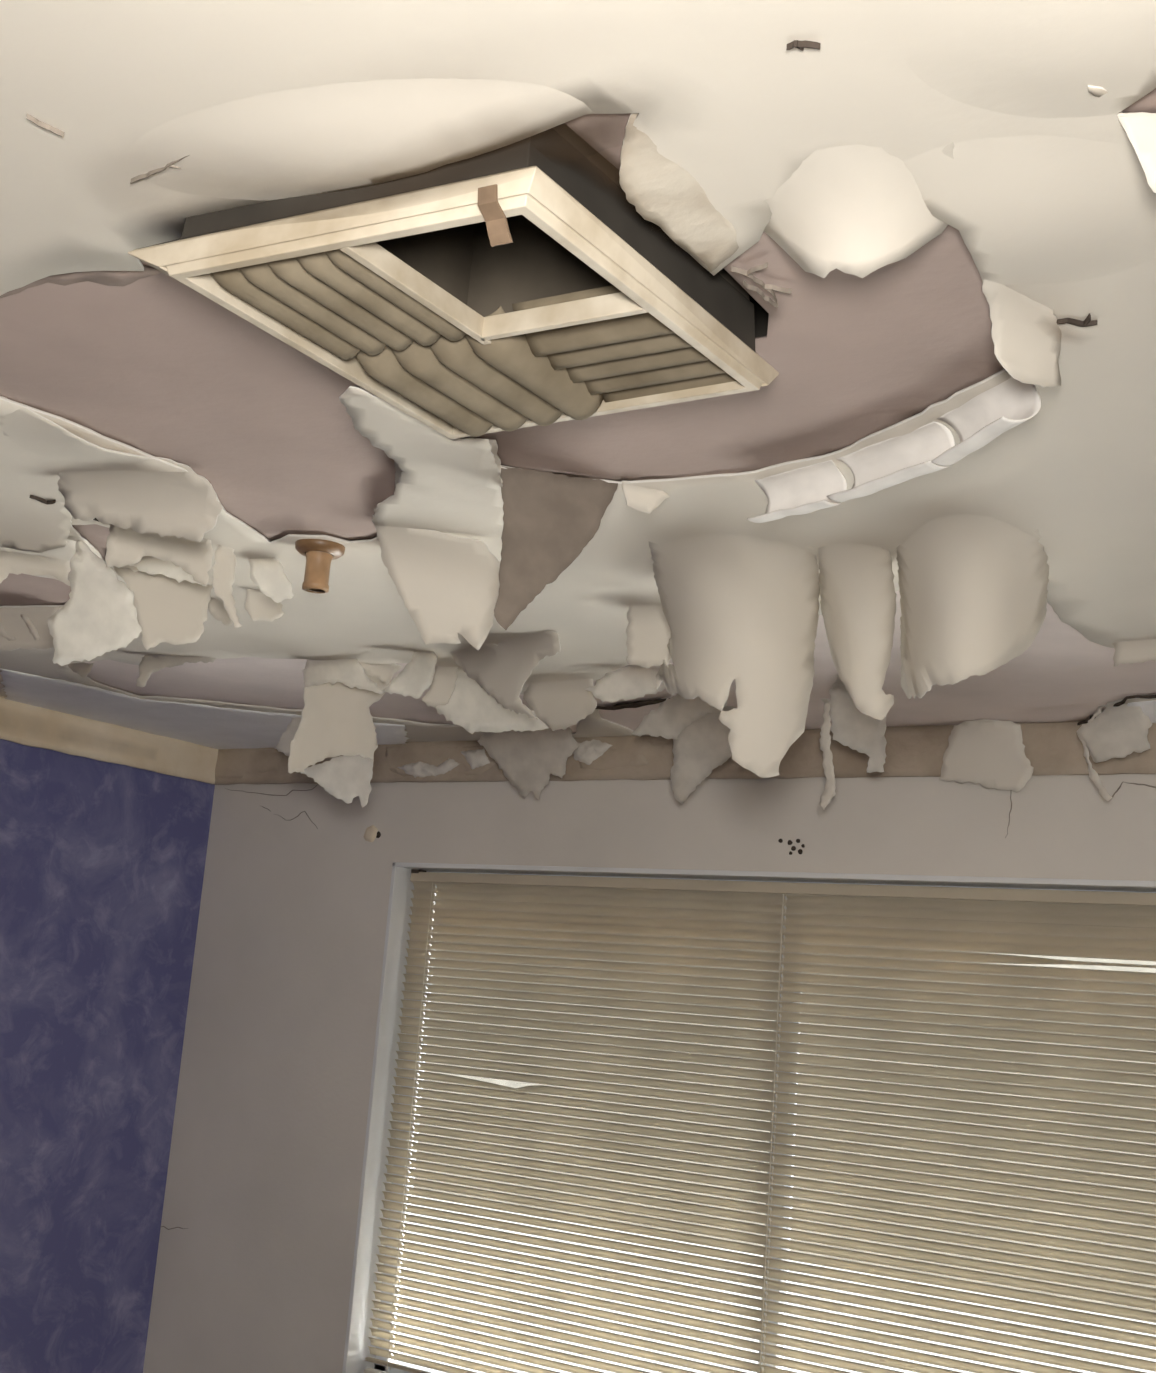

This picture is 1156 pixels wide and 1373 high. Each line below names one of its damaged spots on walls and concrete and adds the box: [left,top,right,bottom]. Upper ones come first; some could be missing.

peeling [1088,85,1108,97]
peeling [1117,88,1156,193]
peeling [0,113,1156,810]